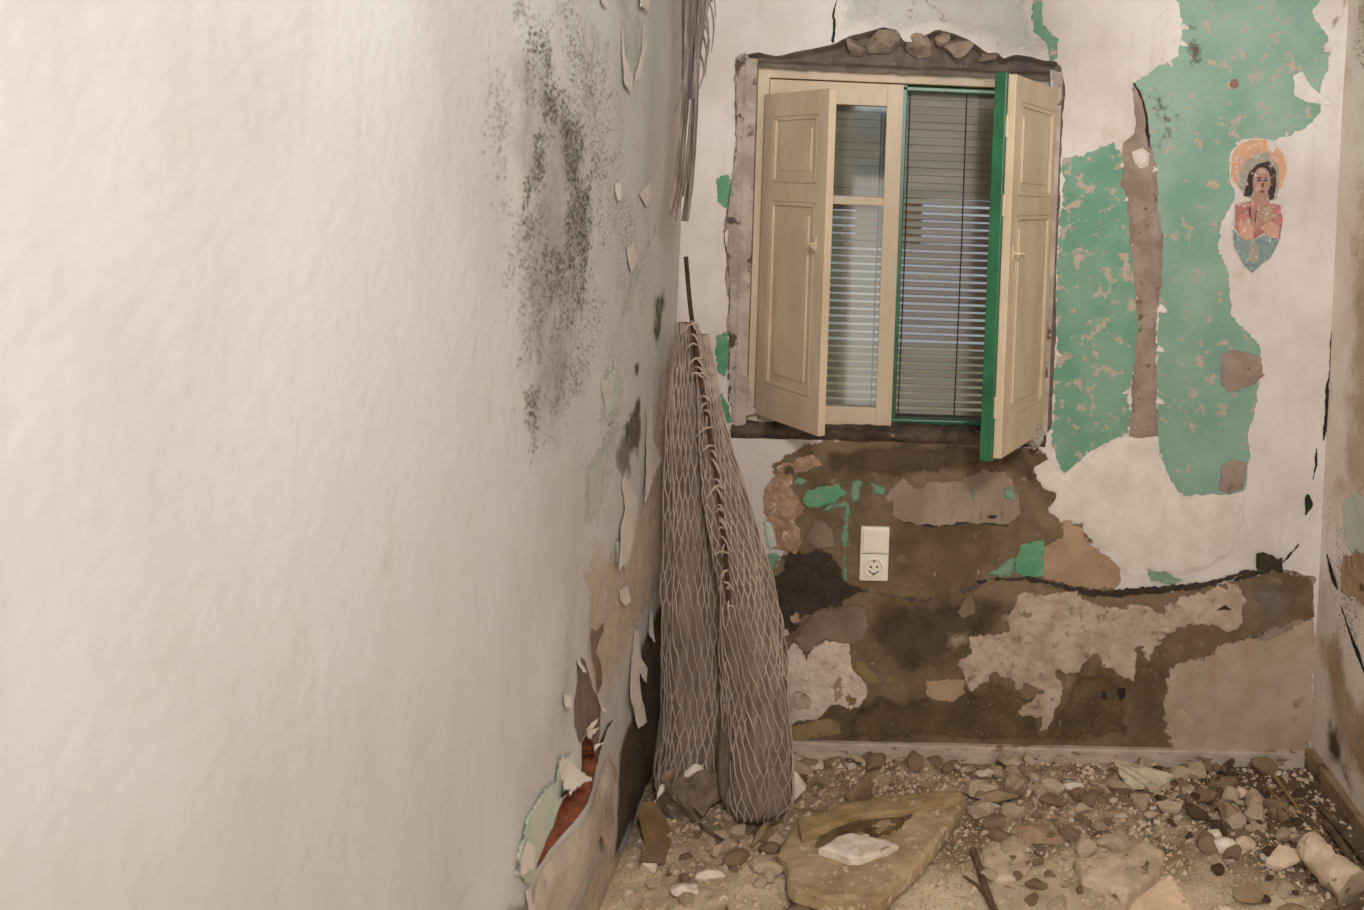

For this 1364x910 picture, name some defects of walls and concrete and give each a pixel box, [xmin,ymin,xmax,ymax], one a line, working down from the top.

peeling [621,0,650,92]
spalling [514,622,613,910]
peeling [715,0,1339,496]
flaking render [763,440,1316,750]
leakage [771,440,1314,748]
crack [976,332,1364,672]
leakage [1322,483,1364,779]
peeling [1341,491,1364,605]
leakage [1348,262,1364,495]